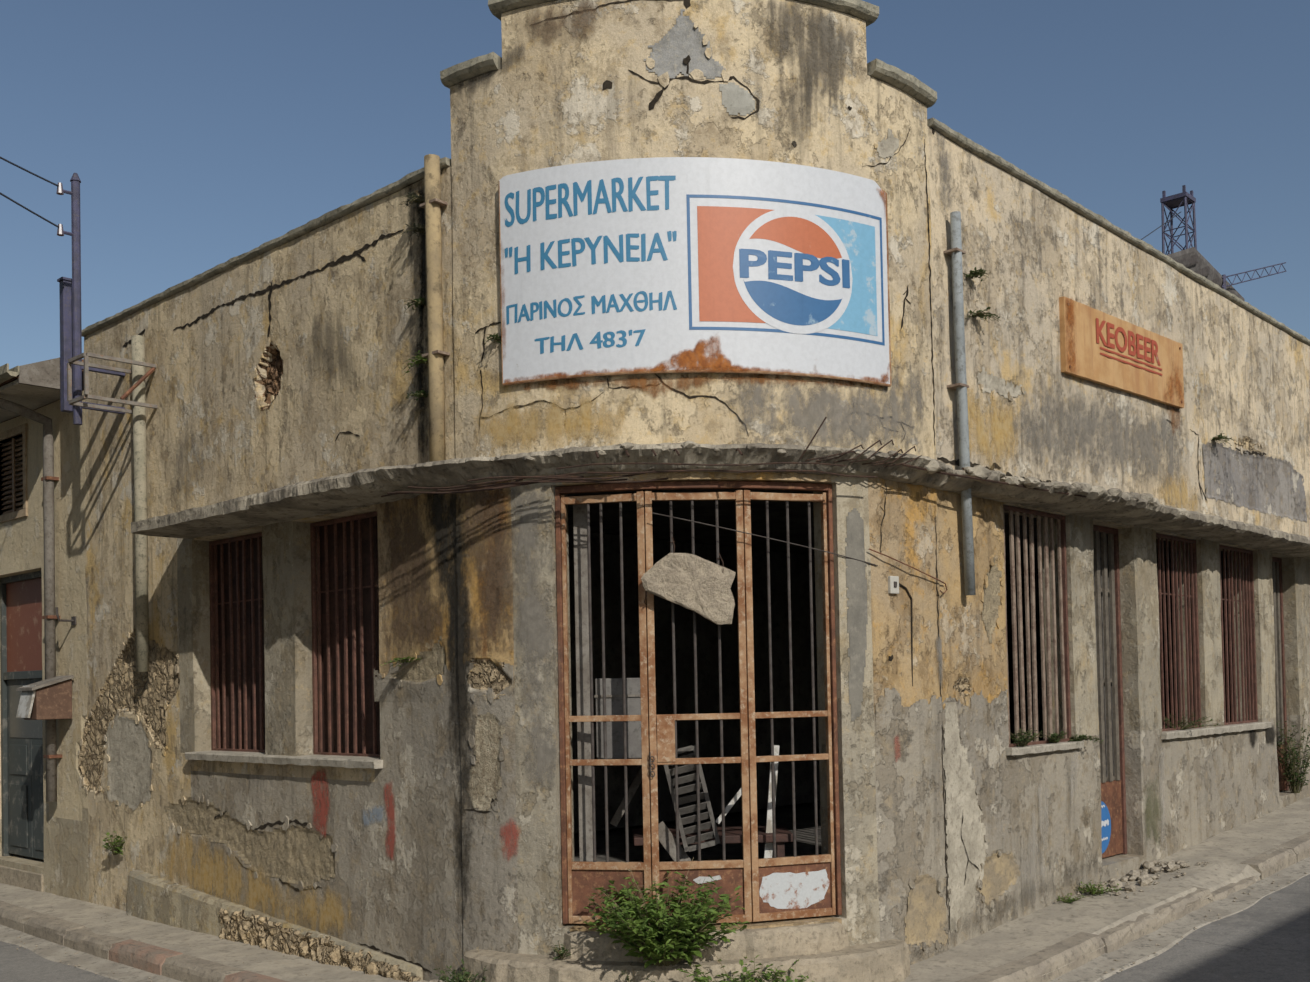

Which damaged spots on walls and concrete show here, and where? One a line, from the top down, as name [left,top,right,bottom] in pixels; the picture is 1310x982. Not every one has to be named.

crack [531,0,633,25]
peeling [644,9,730,88]
crack [628,63,760,120]
water stain [770,0,854,138]
water stain [937,132,951,203]
crack [123,229,404,347]
crack [475,322,749,436]
water stain [967,387,1197,509]
peeling [1202,436,1307,523]
water stain [383,483,557,917]
spalling [78,626,338,893]
peeling [904,677,1020,951]